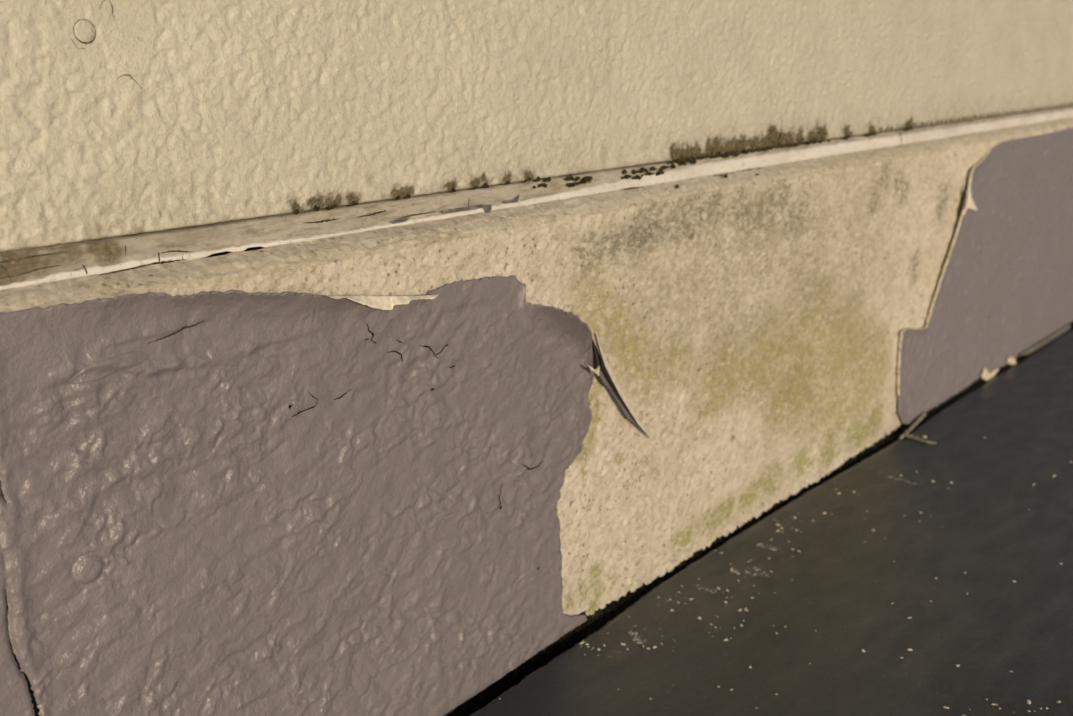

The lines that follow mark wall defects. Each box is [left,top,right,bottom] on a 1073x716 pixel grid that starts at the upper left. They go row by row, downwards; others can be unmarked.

leakage [575,184,803,269]
peeling [167,128,1071,616]
crack [5,589,40,716]